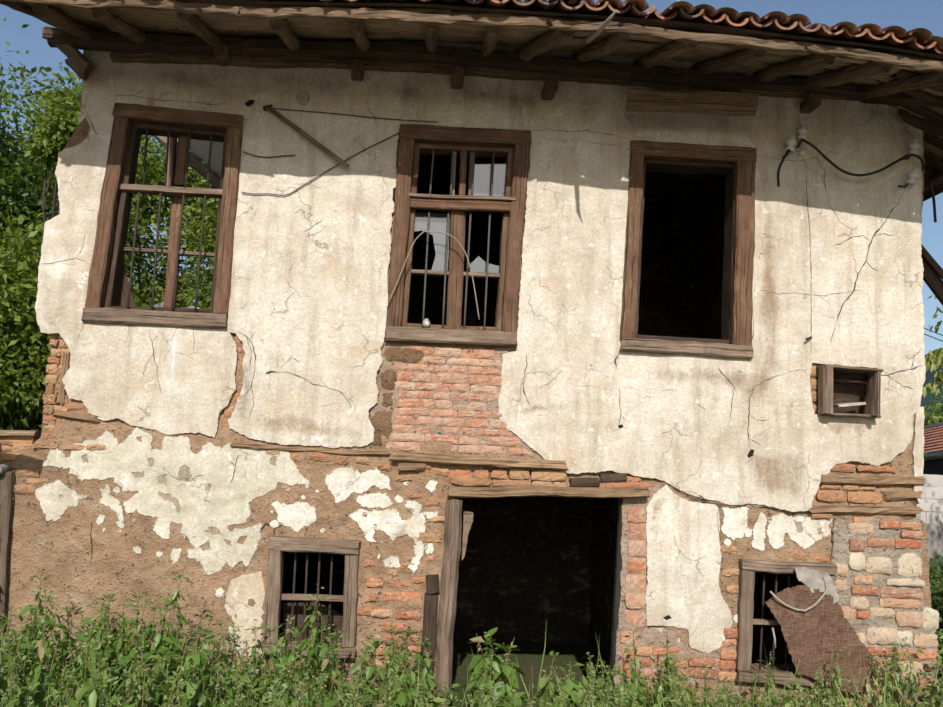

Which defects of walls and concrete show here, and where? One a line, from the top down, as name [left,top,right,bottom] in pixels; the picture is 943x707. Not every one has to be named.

crack [758,155,906,340]
peeling [13,334,740,707]
crack [719,369,798,450]
spalling [720,463,940,707]